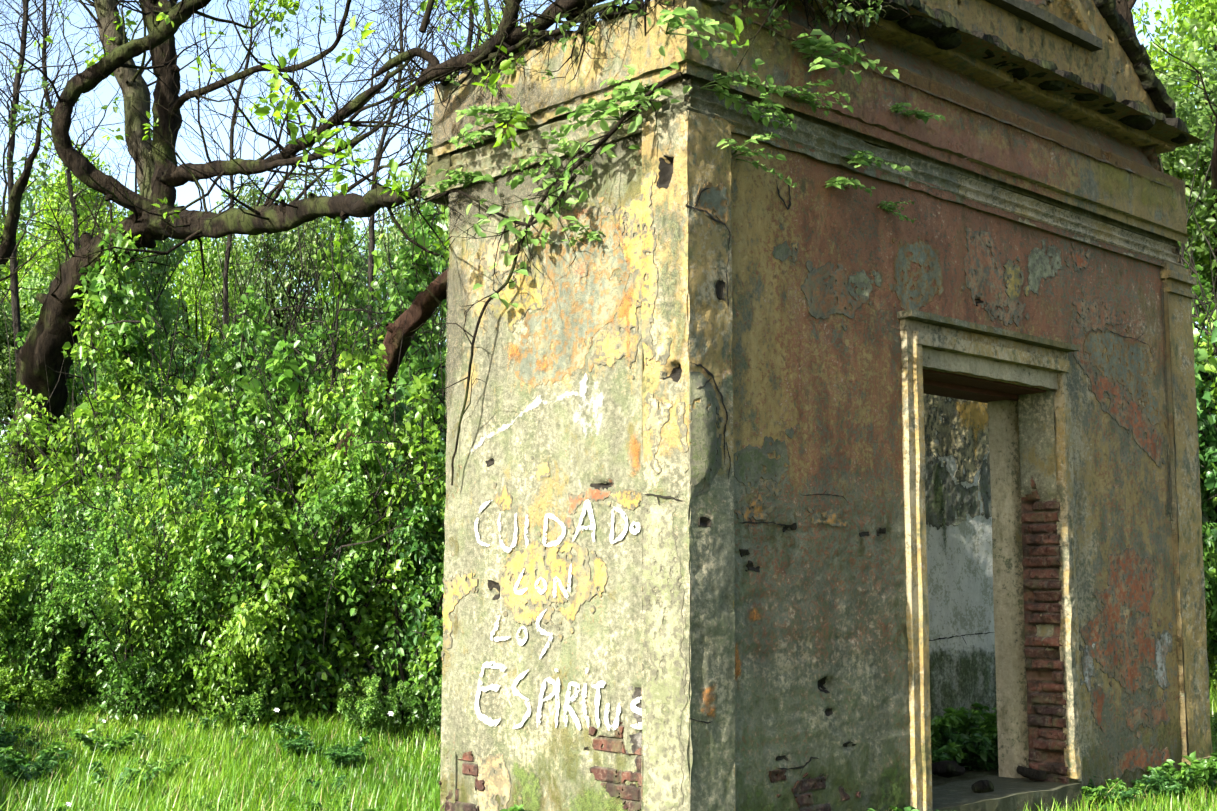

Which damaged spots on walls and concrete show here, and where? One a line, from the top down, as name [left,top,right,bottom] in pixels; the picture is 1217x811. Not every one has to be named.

crack [686,188,731,307]
flaking render [772,224,944,331]
flaking render [961,226,1167,467]
flaking render [498,478,688,811]
flaking render [1021,477,1069,784]
peeling [1079,547,1173,779]
flaking render [768,769,861,811]